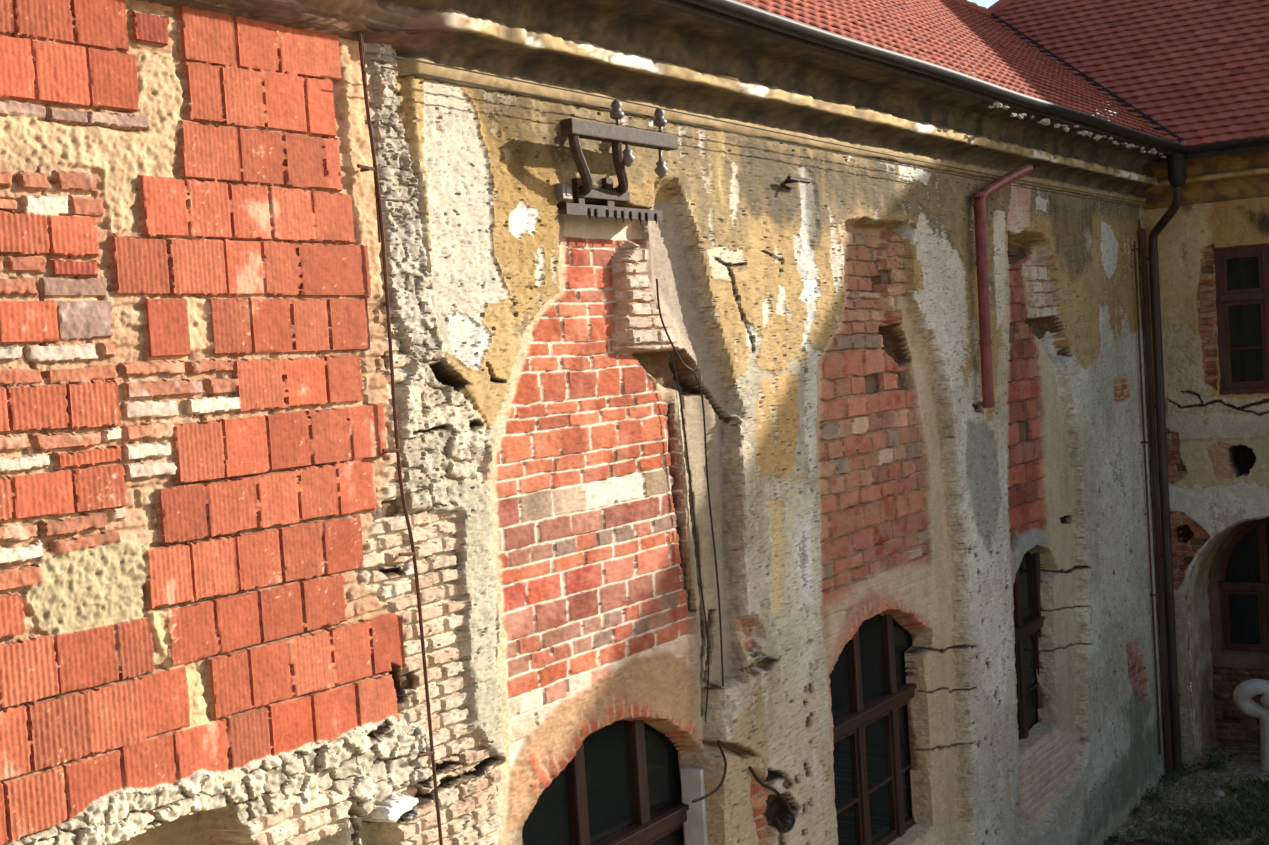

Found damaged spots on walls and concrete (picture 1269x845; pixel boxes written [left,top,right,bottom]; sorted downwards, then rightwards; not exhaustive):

peeling [993,183,1139,423]
hole [632,348,701,396]
flaking render [1163,244,1269,484]
crack [1168,390,1269,415]
crack [1060,515,1073,524]
flaking render [1170,511,1210,590]
crack [1041,565,1092,573]
crack [1041,604,1091,612]
crack [904,643,977,654]
crack [927,685,978,693]
crack [910,741,975,751]
spalling [702,738,814,845]